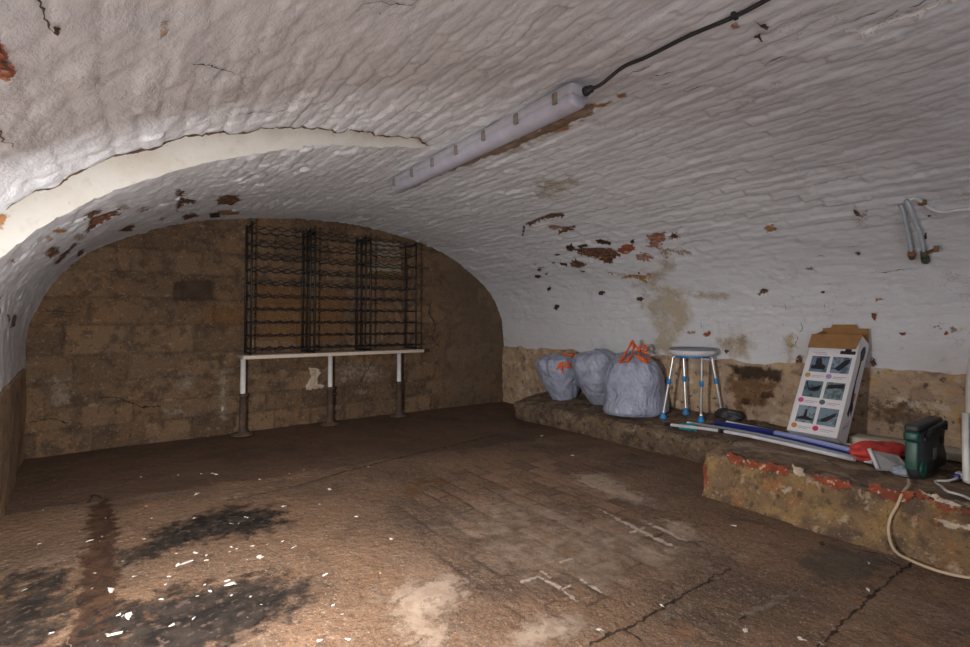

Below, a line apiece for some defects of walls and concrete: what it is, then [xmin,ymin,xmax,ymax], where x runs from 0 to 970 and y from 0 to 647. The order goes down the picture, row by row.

spalling [0,40,16,82]
spalling [41,205,148,264]
peeling [174,189,198,220]
spalling [210,195,244,218]
spalling [522,213,576,236]
spalling [534,231,692,283]
water stain [724,365,781,412]
water stain [162,512,272,543]
water stain [132,595,282,647]
crack [588,568,731,647]
crack [738,589,796,620]
crack [816,549,911,647]